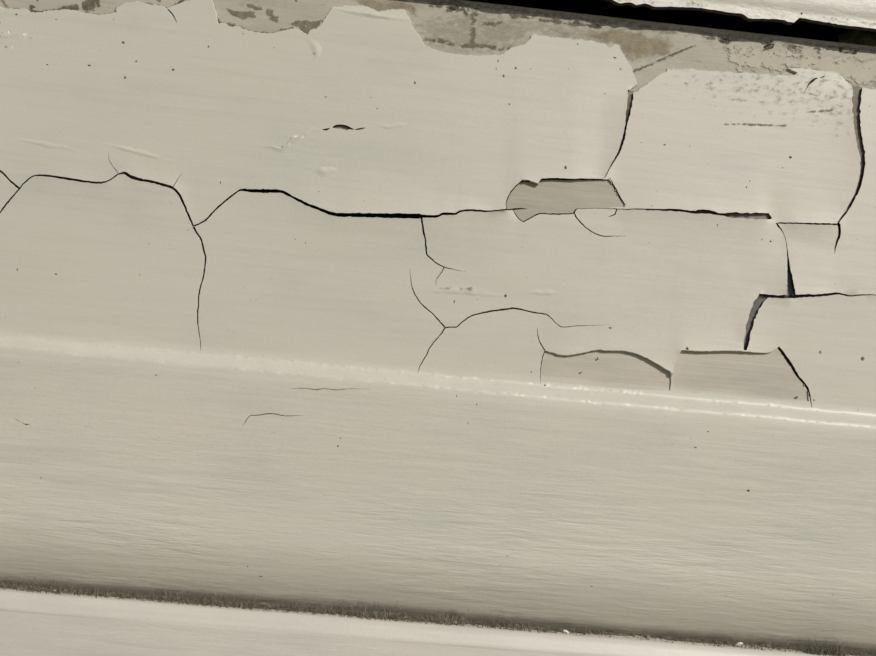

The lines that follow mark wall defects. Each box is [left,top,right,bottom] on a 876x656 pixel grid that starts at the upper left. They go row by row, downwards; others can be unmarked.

peeling [0,0,189,14]
peeling [212,0,876,93]
crack [0,86,864,341]
peeling [506,180,624,221]
crack [410,277,594,375]
crack [744,260,876,350]
peeling [541,348,808,401]
crack [778,347,810,398]